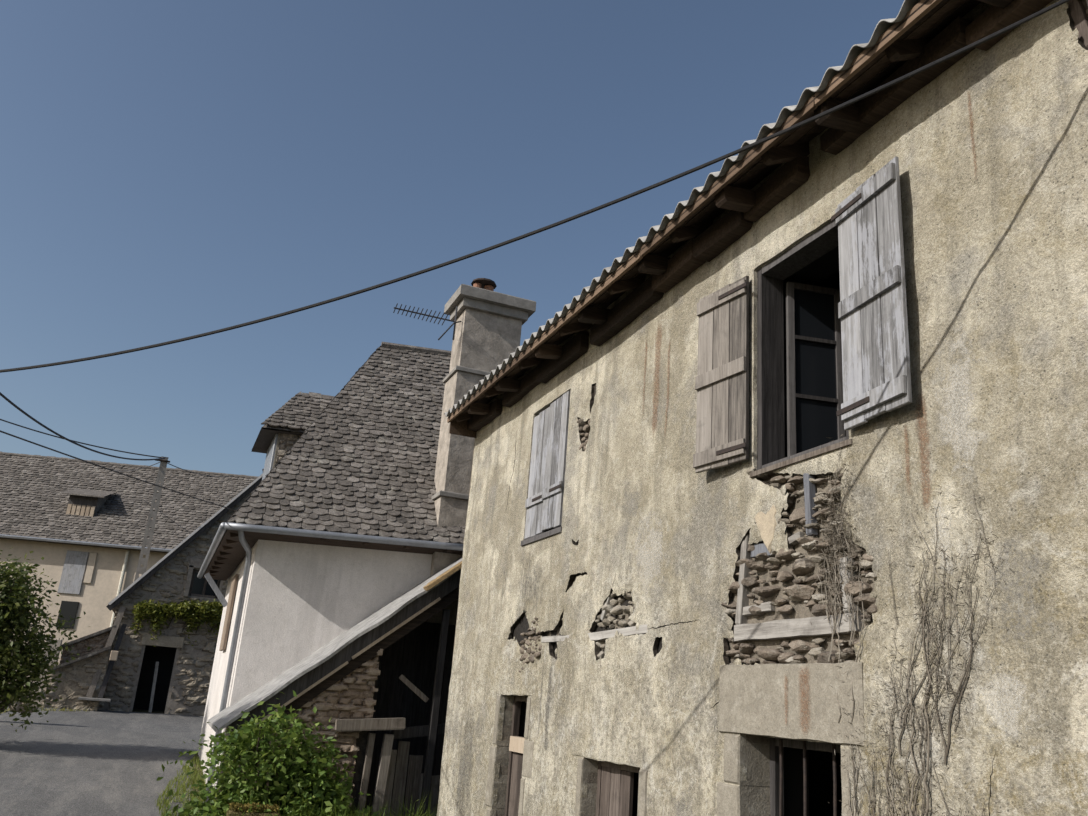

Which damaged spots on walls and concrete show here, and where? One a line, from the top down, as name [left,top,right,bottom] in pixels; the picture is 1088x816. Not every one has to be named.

spalling [721,468,878,665]
spalling [512,612,569,672]
spalling [588,589,662,661]